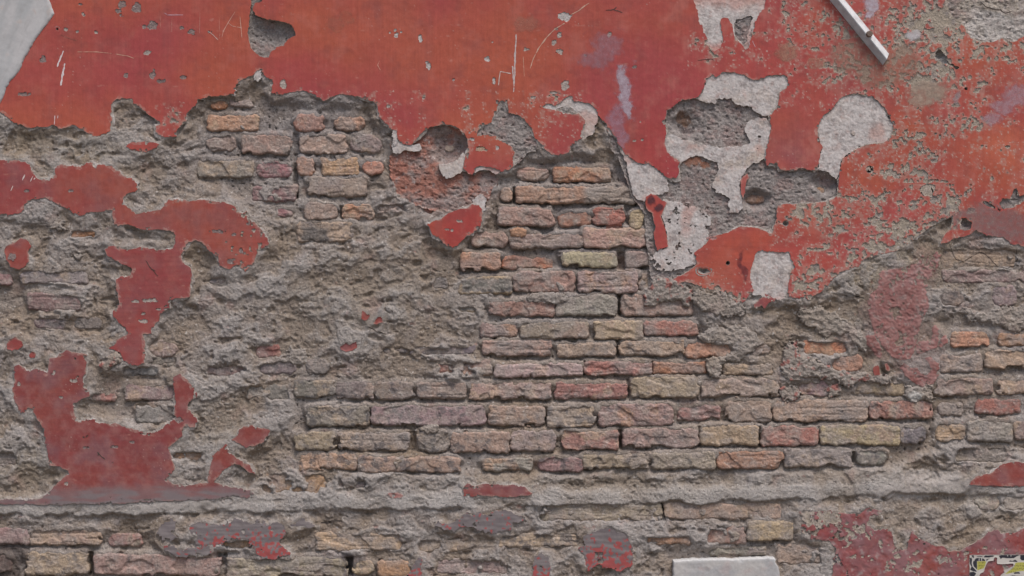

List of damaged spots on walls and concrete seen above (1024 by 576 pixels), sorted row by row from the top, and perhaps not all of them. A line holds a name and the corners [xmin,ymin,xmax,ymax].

spalling [248,0,296,58]
peeling [698,73,788,116]
spalling [665,98,768,148]
peeling [439,153,465,179]
peeling [665,134,749,163]
peeling [880,129,948,186]
peeling [837,184,891,210]
peeling [811,201,855,237]
peeling [685,227,709,253]